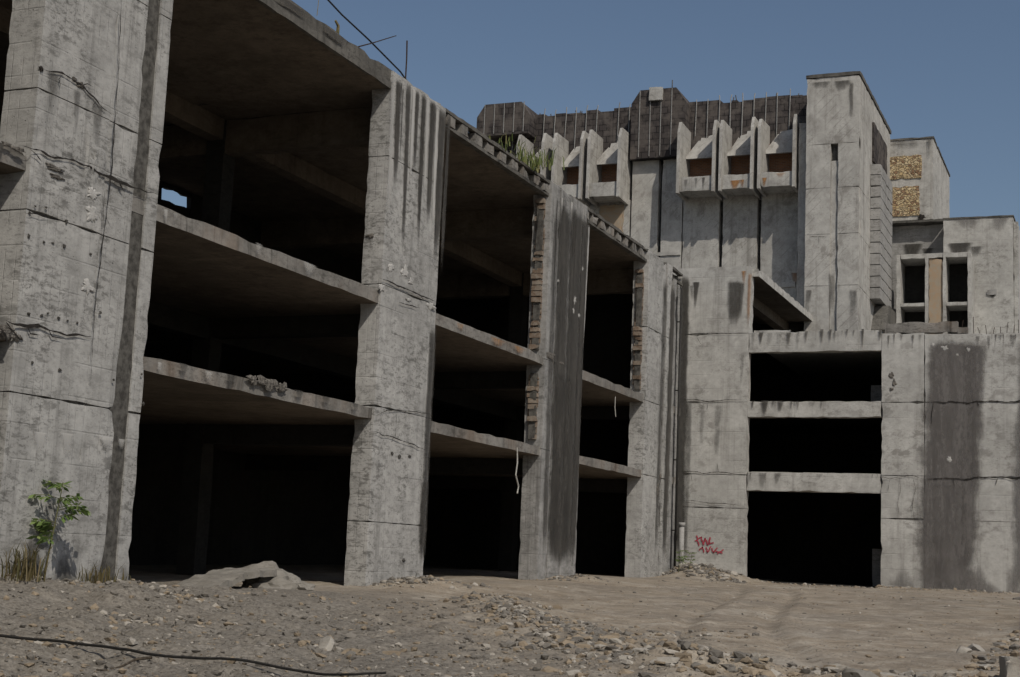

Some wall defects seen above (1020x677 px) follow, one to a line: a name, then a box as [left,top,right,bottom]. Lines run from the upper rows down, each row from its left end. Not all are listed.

crack [0,1,156,385]
damp [388,82,451,251]
damp [544,198,589,558]
damp [919,343,992,592]
crack [929,400,1020,423]